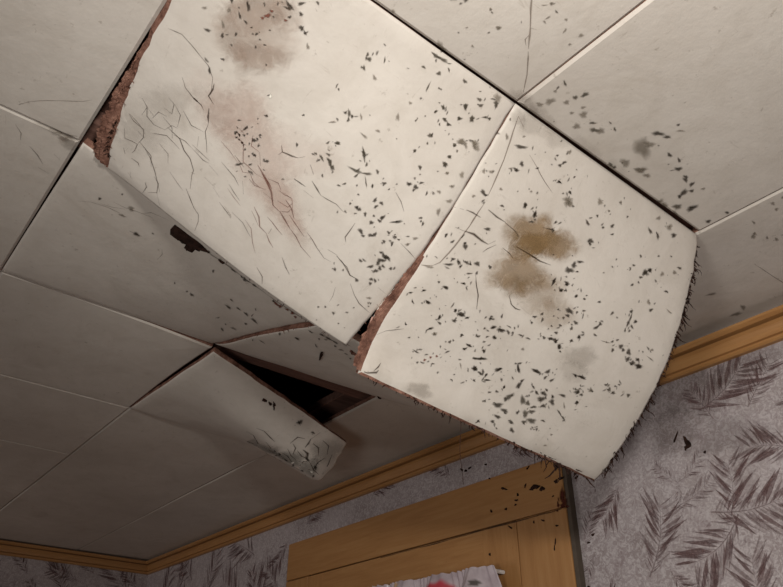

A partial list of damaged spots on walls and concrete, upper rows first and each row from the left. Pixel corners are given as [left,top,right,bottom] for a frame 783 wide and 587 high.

crack [124,30,214,229]
spalling [170,225,209,253]
water stain [337,149,417,285]
water stain [498,203,588,300]
water stain [413,314,565,432]
water stain [530,308,585,352]
water stain [594,321,653,368]